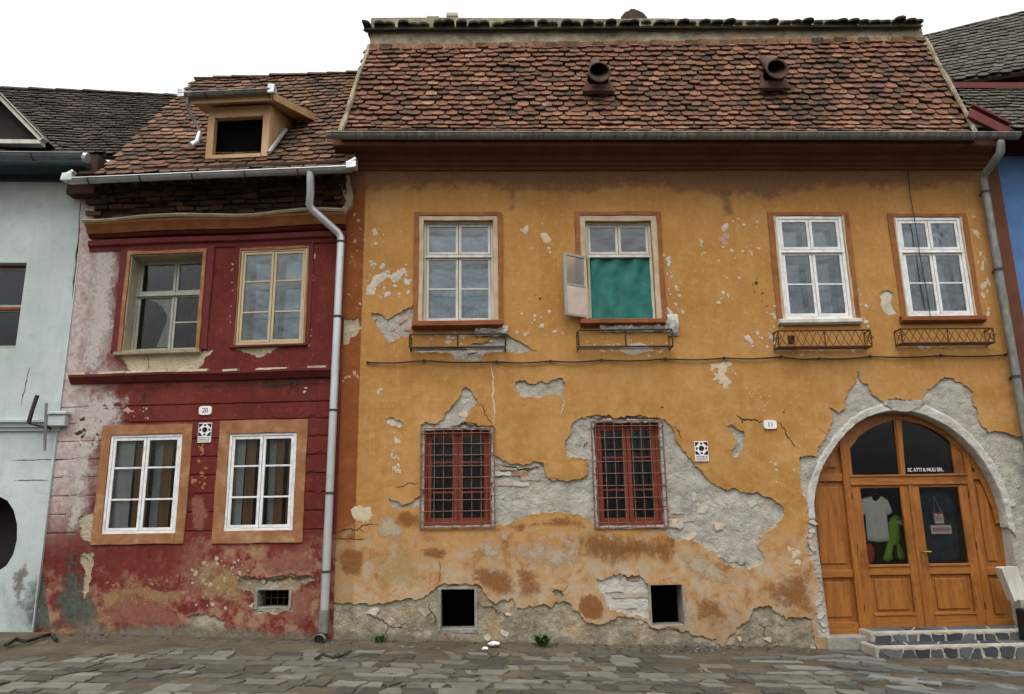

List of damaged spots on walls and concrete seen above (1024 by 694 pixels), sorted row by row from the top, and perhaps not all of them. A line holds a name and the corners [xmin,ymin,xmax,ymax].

flaking render [81,174,413,345]
spalling [858,289,897,328]
crack [452,369,495,428]
peeling [710,362,770,411]
crack [737,415,796,447]
spalling [104,556,316,635]
leakage [188,497,245,605]
leakage [340,550,363,573]
leakage [379,512,418,536]
leakage [474,542,539,596]
leakage [521,545,578,566]
spalling [333,372,1024,648]